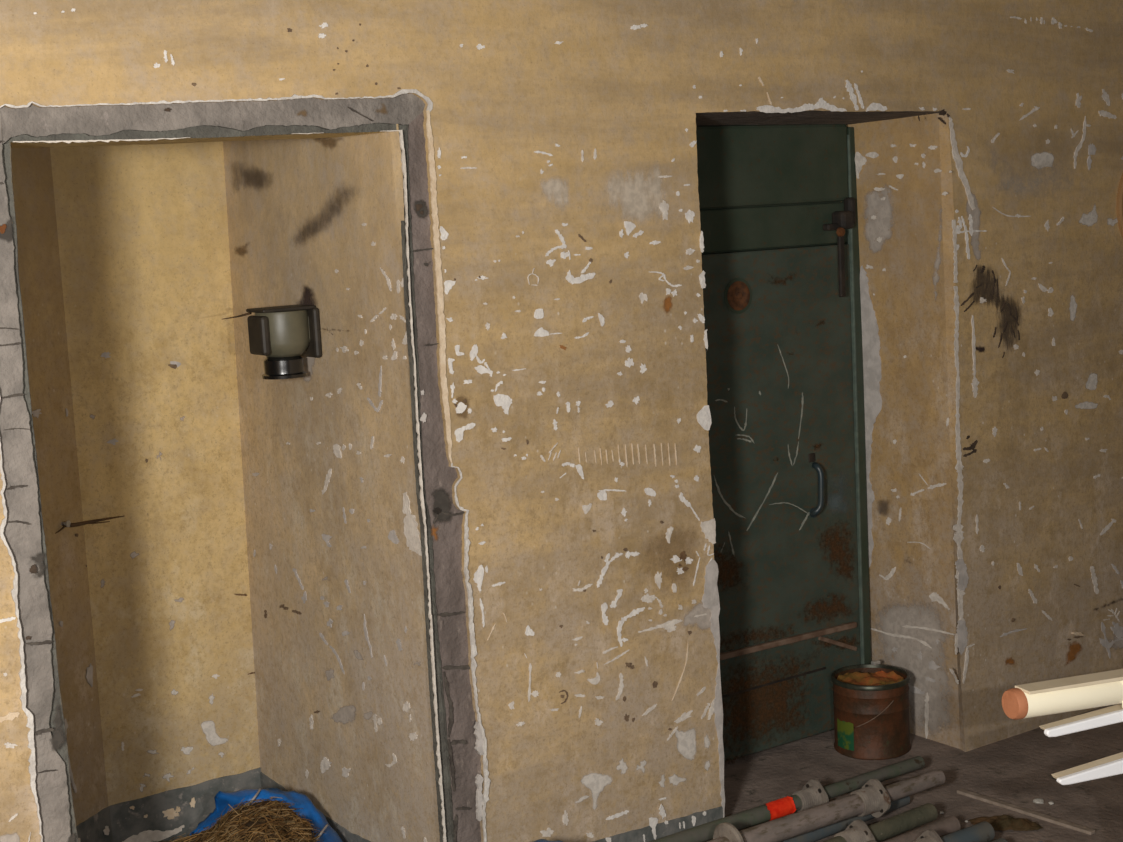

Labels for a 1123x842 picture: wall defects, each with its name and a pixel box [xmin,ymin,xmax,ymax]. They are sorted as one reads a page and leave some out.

peeling [723,70,887,113]
peeling [855,144,952,271]
peeling [545,223,595,284]
peeling [512,296,561,337]
peeling [574,313,605,339]
damp [964,265,1020,358]
spalling [0,89,512,842]
peeling [876,220,985,731]
rust [714,551,740,590]
peeling [555,662,604,699]
spalling [572,519,725,818]
peeling [540,758,646,837]